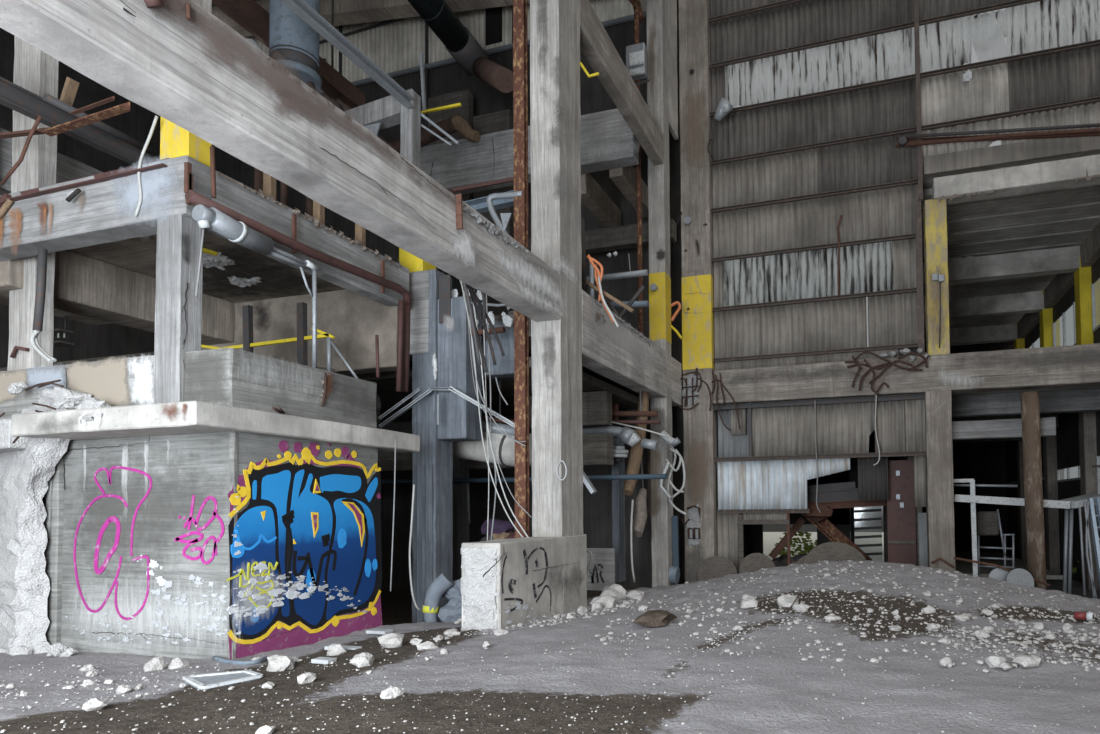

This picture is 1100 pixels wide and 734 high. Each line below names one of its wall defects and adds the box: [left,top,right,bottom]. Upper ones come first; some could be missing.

corrosion [0,210,22,240]
corrosion [37,203,52,228]
spalling [218,171,402,268]
spalling [7,379,111,424]
spalling [0,437,79,657]
peeling [65,555,368,644]